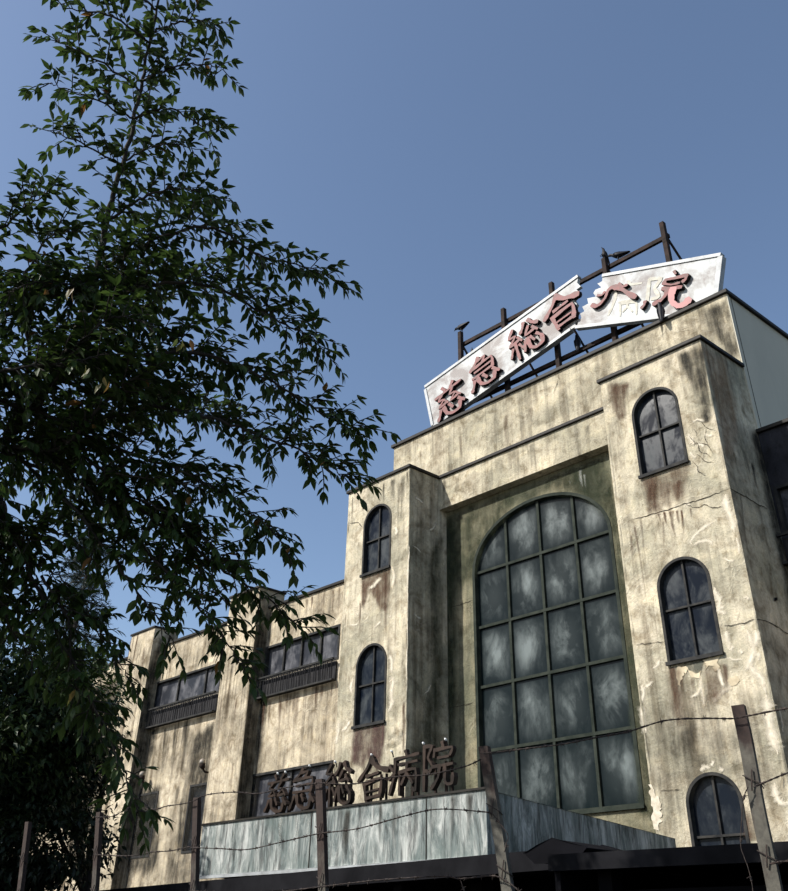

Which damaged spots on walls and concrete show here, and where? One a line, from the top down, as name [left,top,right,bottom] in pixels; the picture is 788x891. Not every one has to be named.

damp [679,350,709,422]
crack [635,420,767,519]
rust [649,471,683,527]
rust [363,572,388,608]
flaking render [640,682,652,733]
flaking render [676,629,783,754]
damp [164,725,213,783]
rust [352,723,384,765]
flaking render [648,784,663,830]